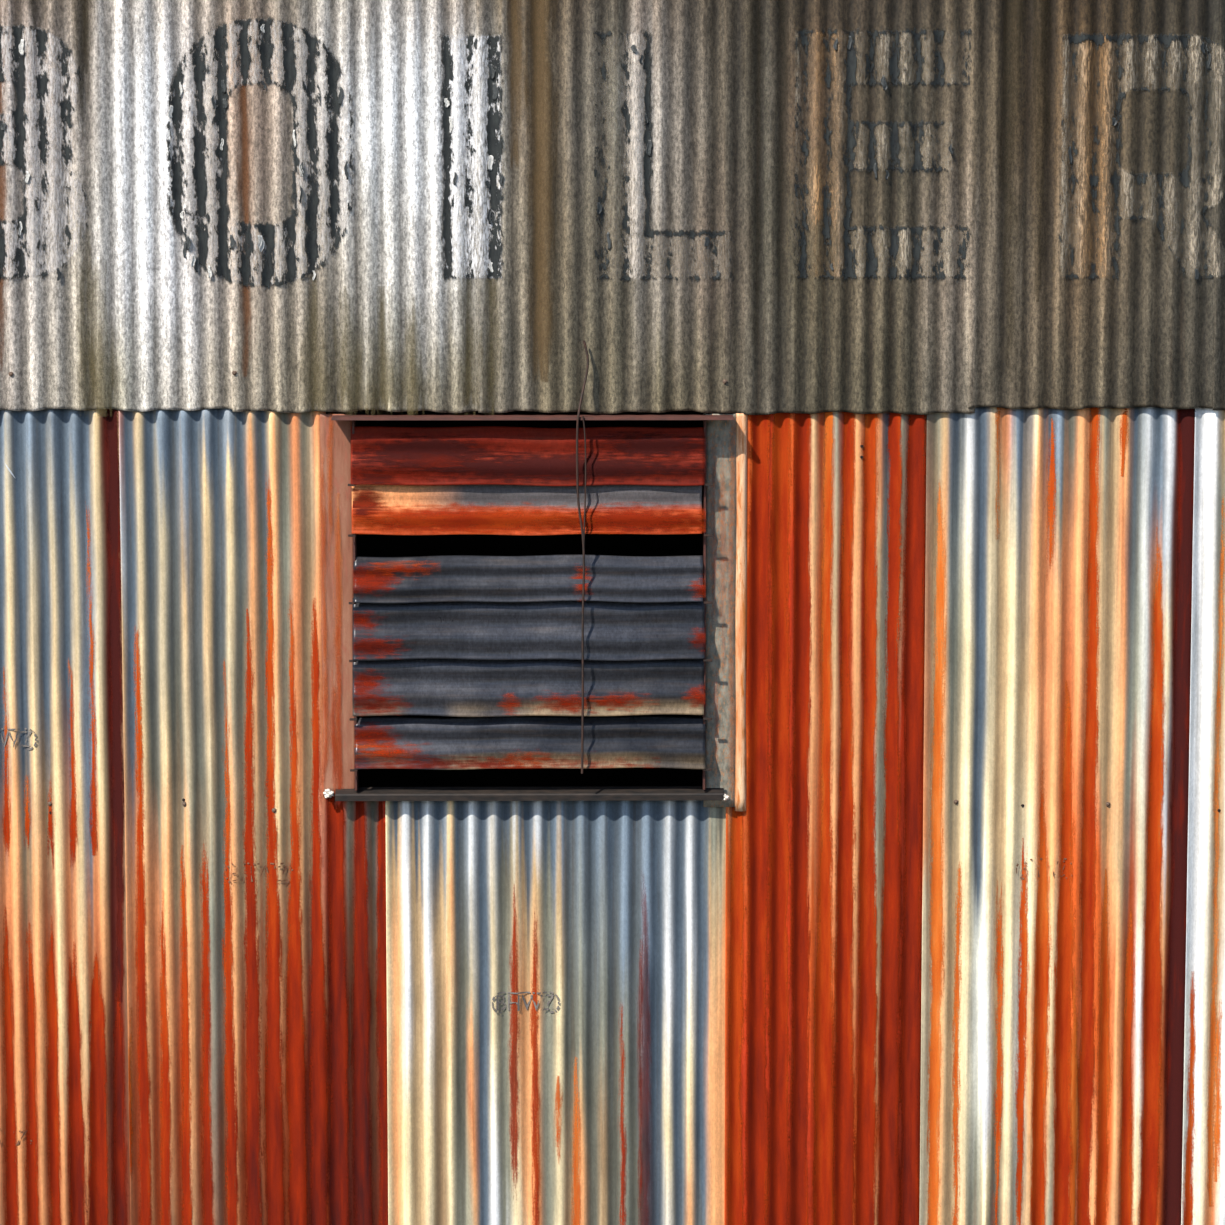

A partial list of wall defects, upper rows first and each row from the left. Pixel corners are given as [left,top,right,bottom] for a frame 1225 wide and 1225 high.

peeling [0,24,89,281]
peeling [166,17,354,289]
peeling [439,34,504,280]
peeling [593,30,733,282]
peeling [793,28,972,281]
peeling [1059,32,1225,280]
rust [1,409,706,1225]
rust [726,412,964,1225]
rust [993,407,1225,1225]